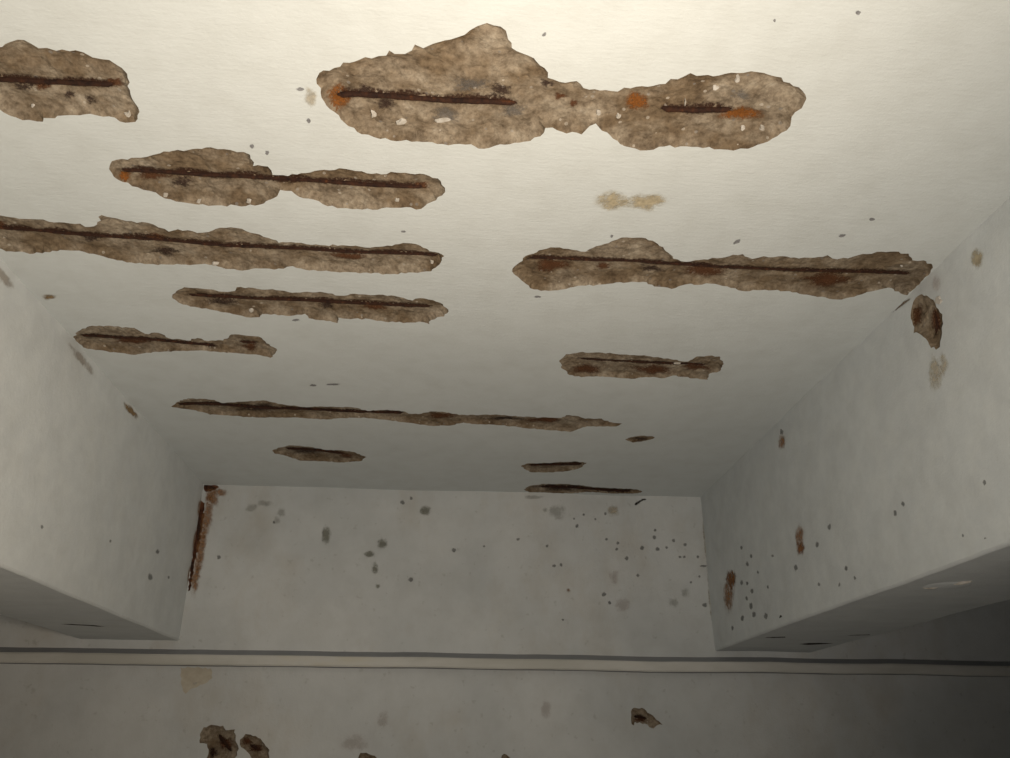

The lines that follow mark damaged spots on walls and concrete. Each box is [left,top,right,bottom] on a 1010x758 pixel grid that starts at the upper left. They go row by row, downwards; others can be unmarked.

spalling [0,40,139,123]
spalling [316,23,806,151]
spalling [109,147,445,210]
spalling [0,215,444,275]
spalling [172,287,449,324]
spalling [512,237,943,349]
spalling [74,326,277,358]
spalling [559,352,724,380]
spalling [171,398,622,432]
spalling [272,445,365,463]
rust [725,571,735,609]
spalling [199,725,269,758]